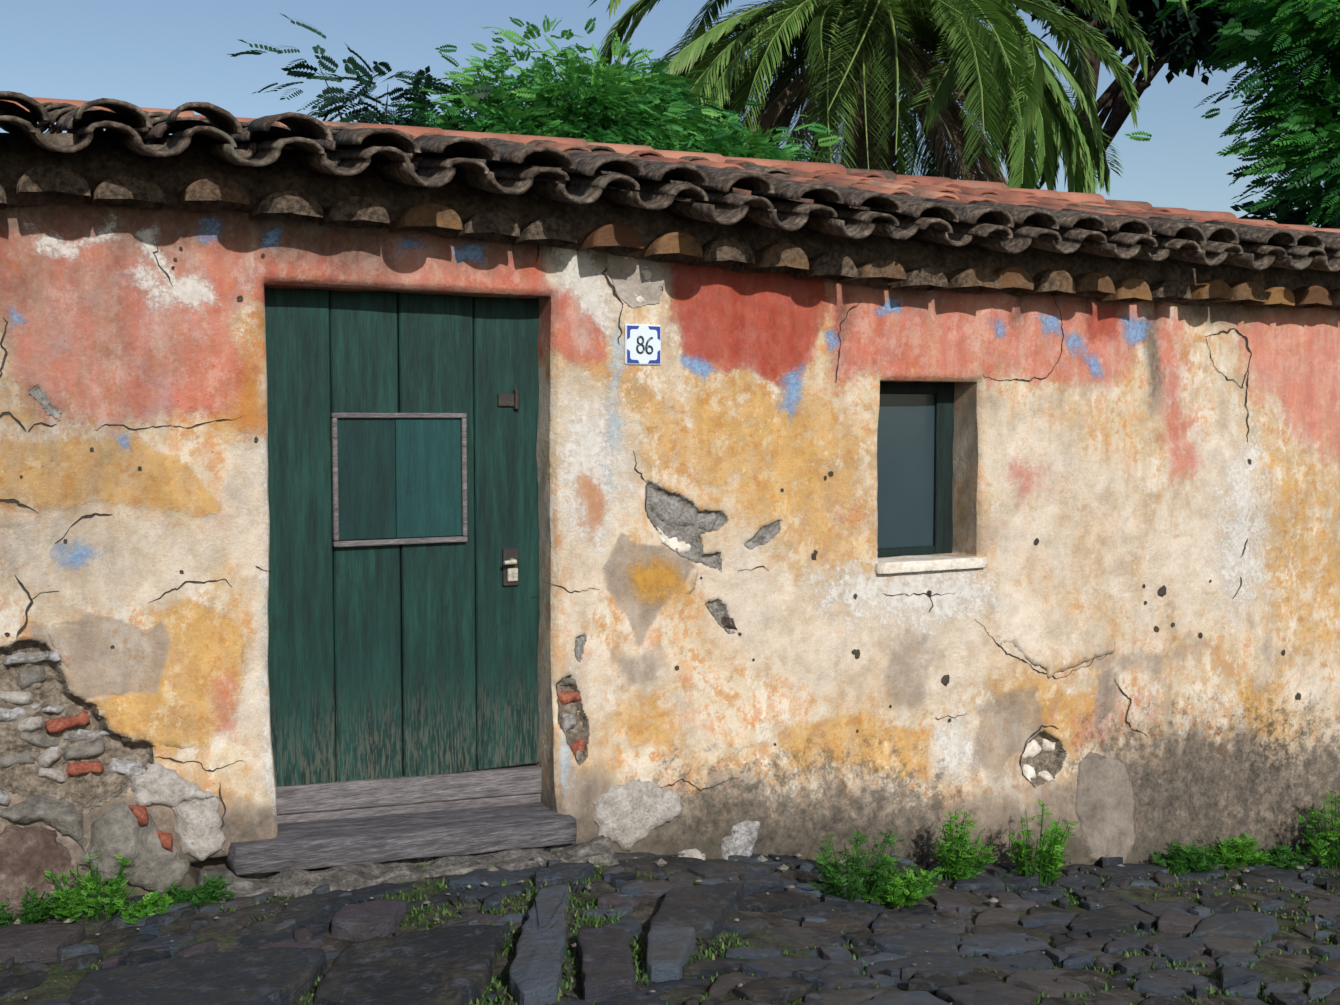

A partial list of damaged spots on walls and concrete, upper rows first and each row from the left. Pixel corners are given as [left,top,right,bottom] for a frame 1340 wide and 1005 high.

flaking render [551,247,729,595]
crack [1205,328,1252,442]
crack [14,574,58,638]
flaking render [0,612,244,818]
crack [158,756,243,831]
crack [151,566,273,602]
flaking render [260,537,276,805]
spalling [556,675,590,785]
spalling [706,599,742,636]
spalling [1019,730,1067,788]
crack [975,619,1147,736]
damp [1092,720,1340,863]